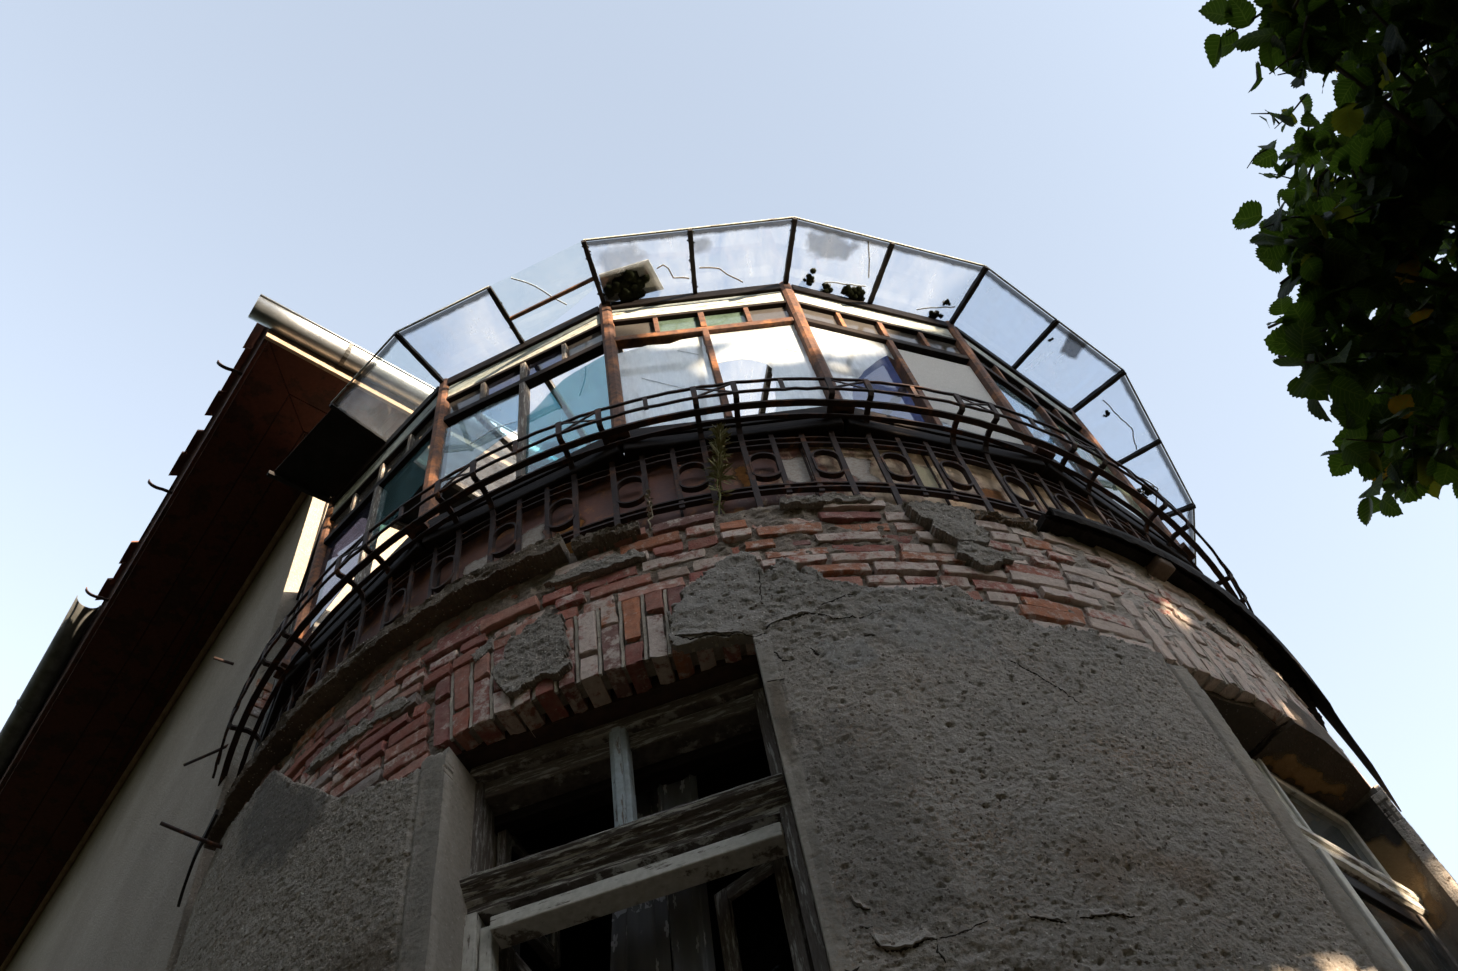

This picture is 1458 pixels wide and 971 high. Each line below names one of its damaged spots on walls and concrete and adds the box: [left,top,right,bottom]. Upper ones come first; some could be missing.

peeling [782,457,814,482]
peeling [845,457,881,482]
peeling [914,465,942,488]
crack [675,570,882,682]
spalling [260,500,1371,798]
spalling [250,679,273,718]